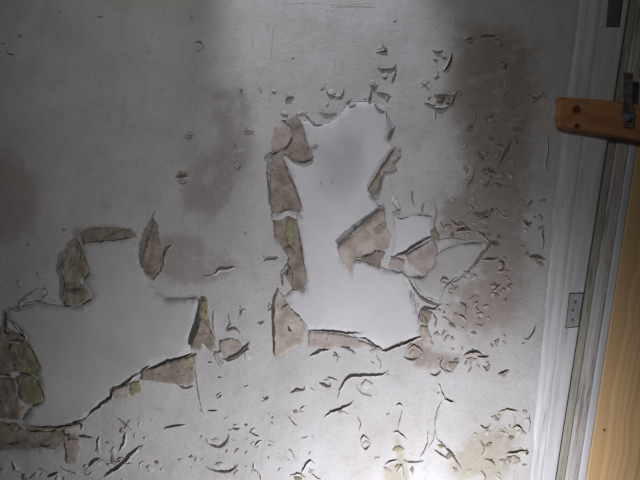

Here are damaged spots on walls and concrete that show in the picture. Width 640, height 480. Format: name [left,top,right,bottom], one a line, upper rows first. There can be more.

peeling [268,64,513,400]
peeling [0,212,263,480]
peeling [201,424,279,454]
peeling [290,451,321,480]
crack [429,384,463,473]